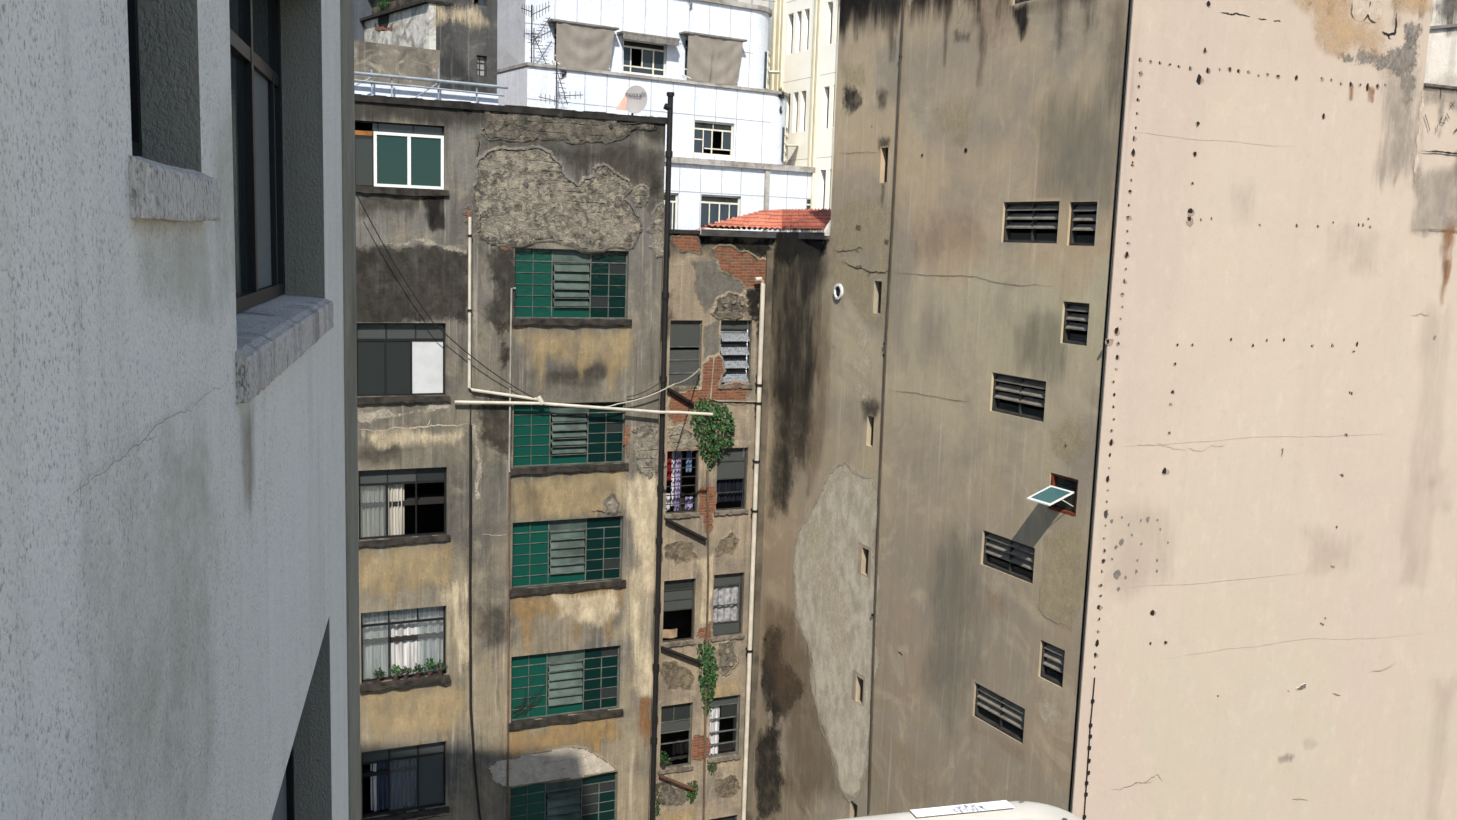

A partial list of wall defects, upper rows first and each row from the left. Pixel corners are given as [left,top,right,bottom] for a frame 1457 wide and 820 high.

spalling [1321,22,1422,104]
spalling [387,110,766,321]
corrosion [1444,220,1455,287]
crack [71,380,228,496]
leakage [771,703,779,733]
flaking render [486,745,618,789]